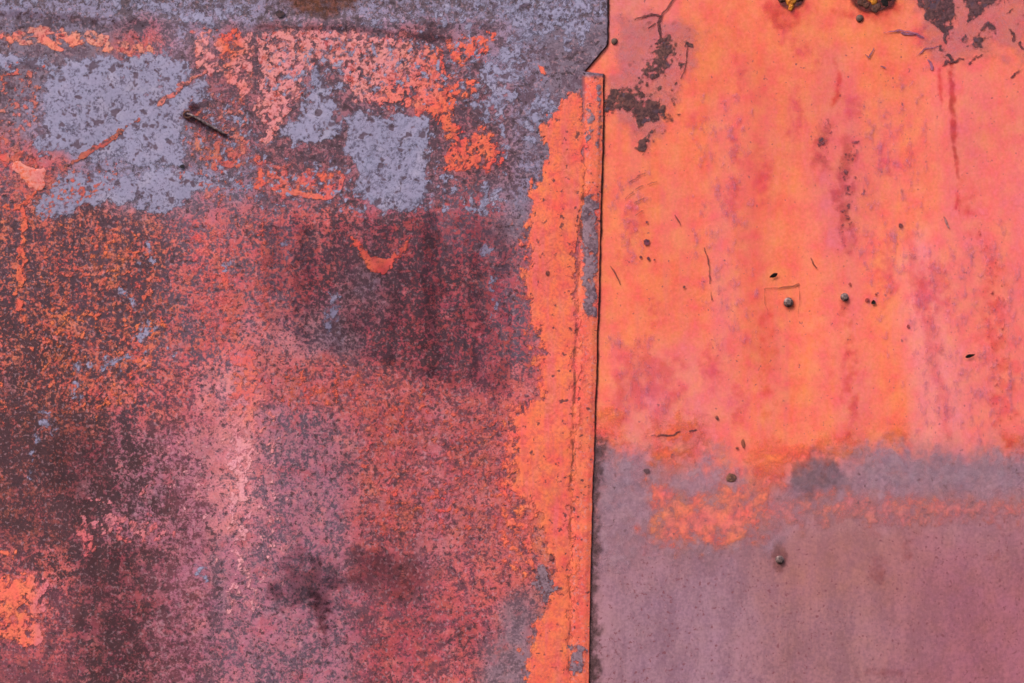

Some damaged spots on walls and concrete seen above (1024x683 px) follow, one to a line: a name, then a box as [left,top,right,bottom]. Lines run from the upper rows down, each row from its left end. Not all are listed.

spalling [603,34,693,152]
spalling [897,0,1001,70]
corrosion [0,161,46,351]
peeling [0,0,603,615]
corrosion [589,74,606,683]
peeling [0,571,64,649]